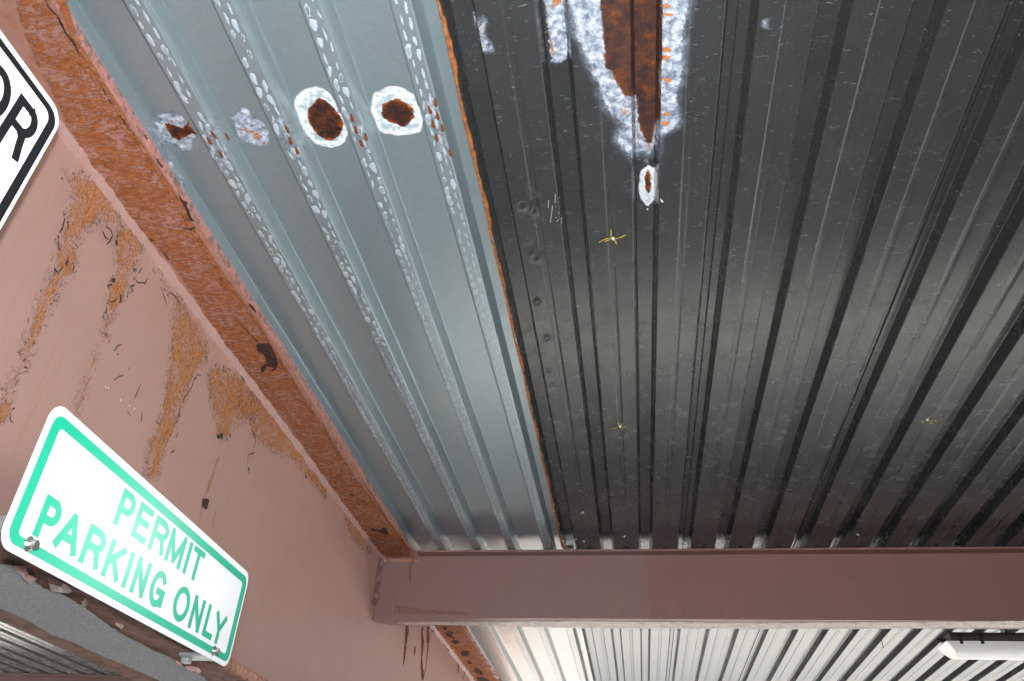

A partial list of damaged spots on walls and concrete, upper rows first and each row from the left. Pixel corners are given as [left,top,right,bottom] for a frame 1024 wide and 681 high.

crack [45,0,80,56]
corrosion [544,0,692,206]
corrosion [0,0,547,574]
peeling [256,343,278,372]
corrosion [395,606,502,681]